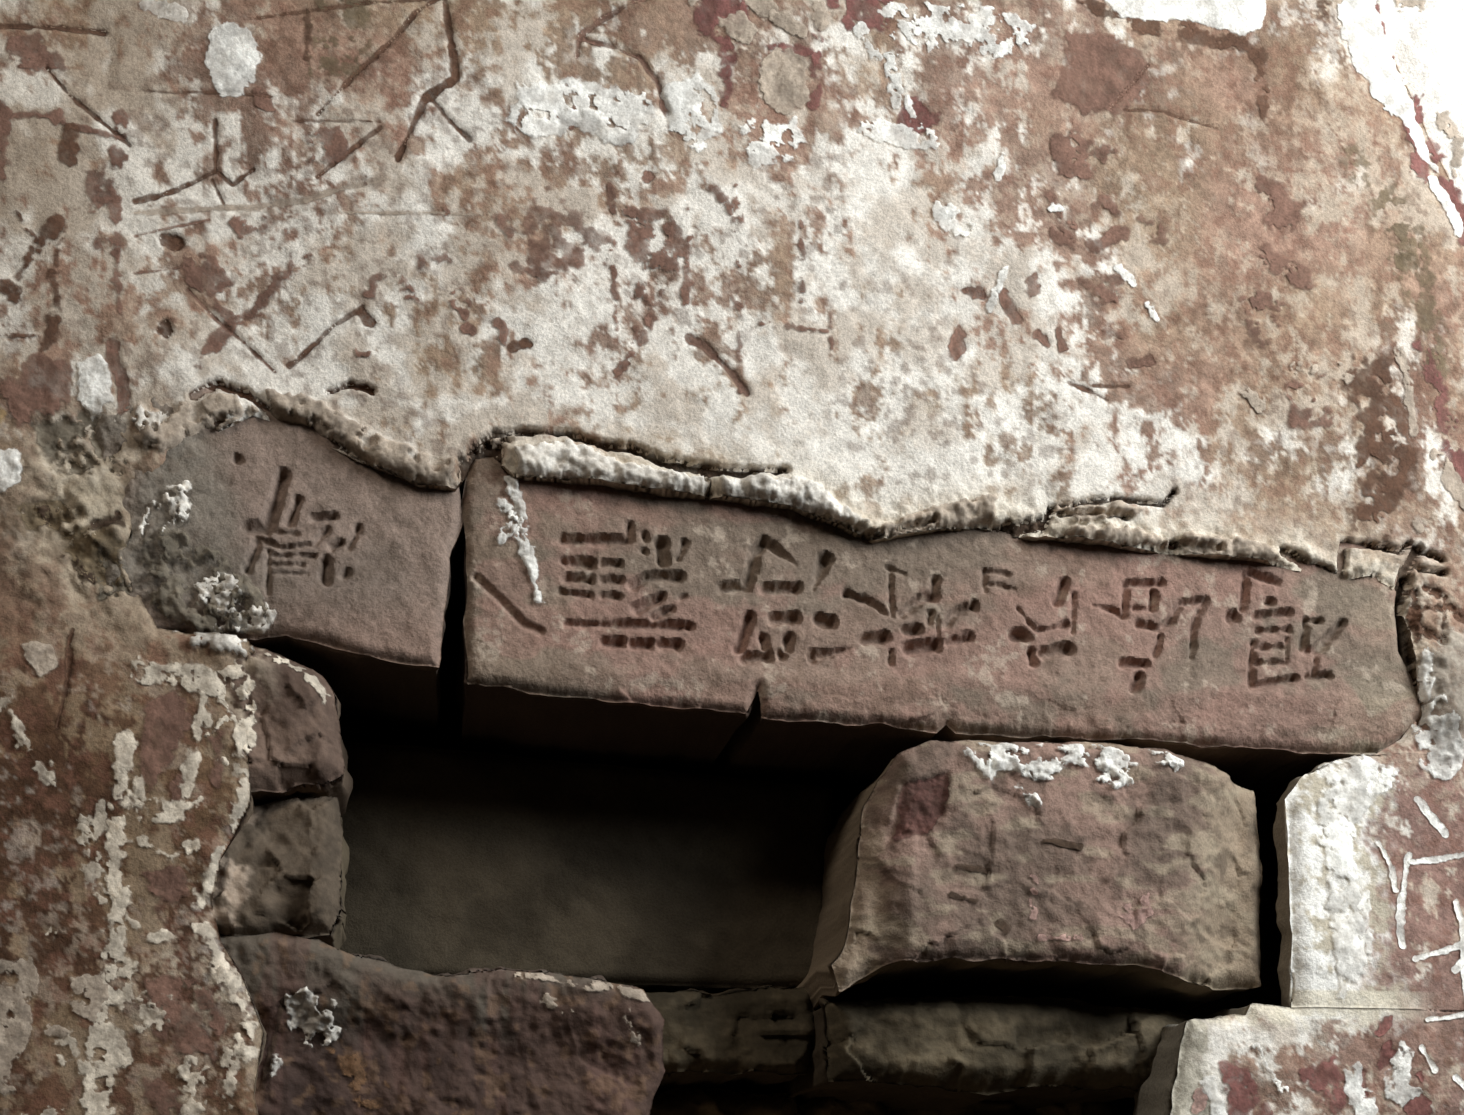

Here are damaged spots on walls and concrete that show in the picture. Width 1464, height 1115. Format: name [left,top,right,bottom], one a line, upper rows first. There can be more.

peeling [1105,0,1266,35]
peeling [1394,346,1418,436]
spalling [457,437,510,481]
crack [468,430,788,497]
peeling [1431,448,1464,509]
crack [862,520,936,540]
crack [992,490,1176,537]
crack [1169,540,1221,553]
spalling [190,632,253,656]
water stain [964,742,1184,807]
spalling [892,773,949,842]
peeling [1343,1015,1433,1115]